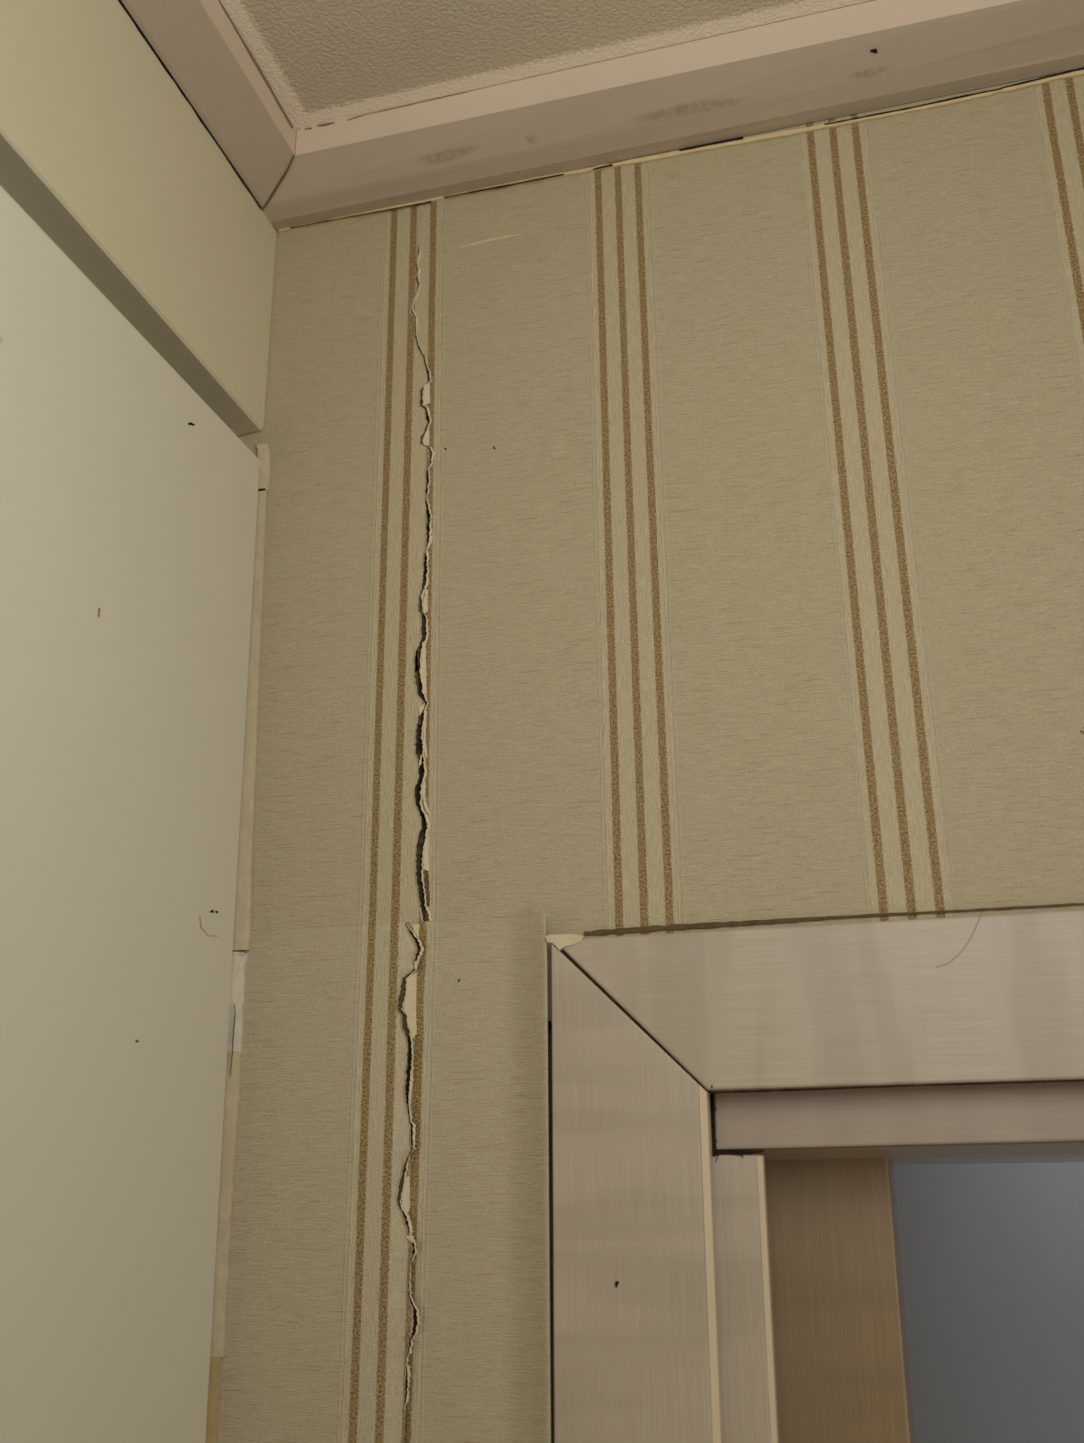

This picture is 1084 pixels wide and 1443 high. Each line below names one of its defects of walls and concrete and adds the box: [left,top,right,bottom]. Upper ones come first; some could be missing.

crack [396,245,435,1443]